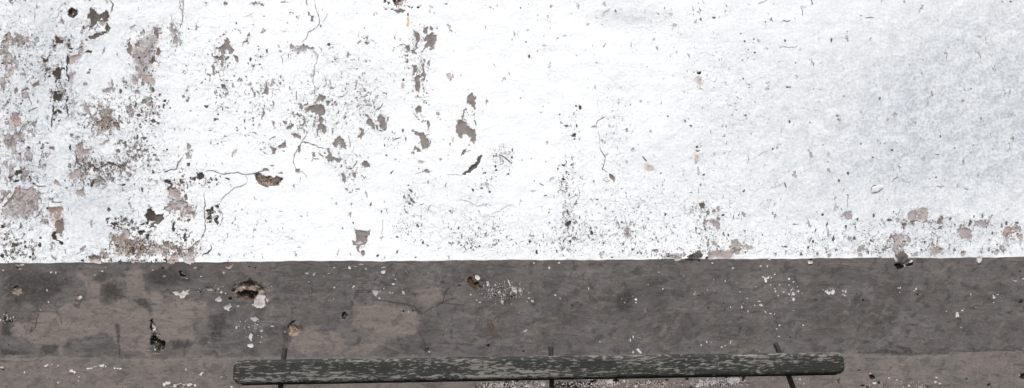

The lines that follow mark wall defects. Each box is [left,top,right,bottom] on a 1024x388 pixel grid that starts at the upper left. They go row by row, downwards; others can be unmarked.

crack [302,0,327,101]
peeling [0,225,42,271]
peeling [80,245,106,276]
peeling [8,0,230,242]
peeling [150,319,166,353]
crack [170,143,258,256]
flaking render [152,226,301,348]
crack [293,130,325,173]
peeling [182,0,438,299]
peeling [446,93,513,193]
peeling [840,200,1023,270]